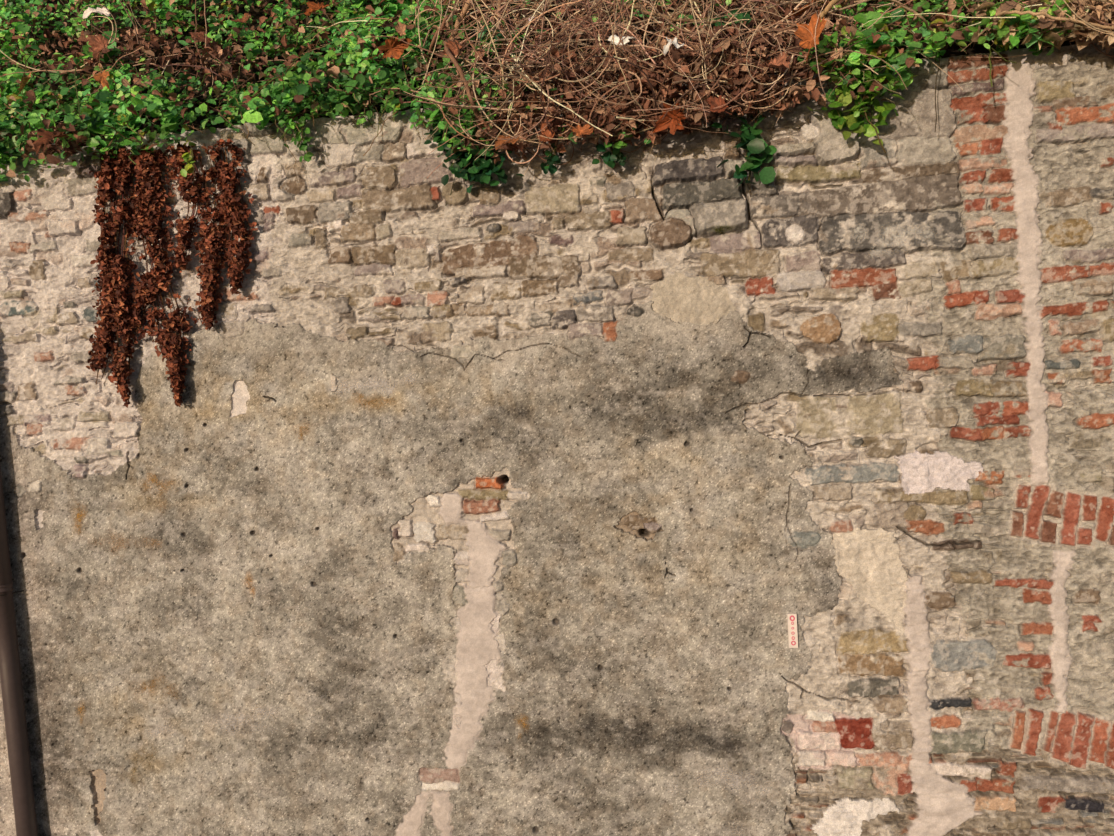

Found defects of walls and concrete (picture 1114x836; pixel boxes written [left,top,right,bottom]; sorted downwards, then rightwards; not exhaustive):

flaking render [650,271,737,325]
crack [390,342,582,370]
flaking render [231,380,250,417]
crack [726,369,899,413]
crack [768,430,844,448]
flaking render [894,450,984,494]
spalling [614,511,664,540]
spalling [391,467,532,692]
flaking render [831,526,908,636]
spalling [781,708,877,770]
flaking render [810,796,899,836]